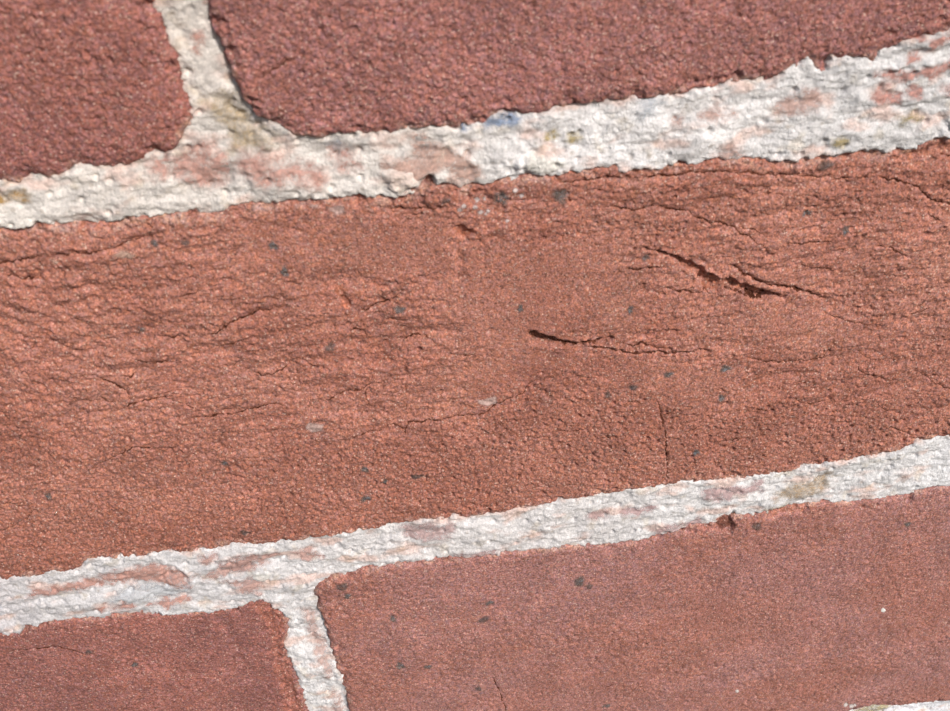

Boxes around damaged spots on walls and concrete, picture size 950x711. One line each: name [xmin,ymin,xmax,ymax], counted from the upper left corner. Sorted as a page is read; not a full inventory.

crack [384,204,452,212]
crack [872,175,950,222]
crack [559,170,881,329]
crack [552,336,705,355]
crack [743,350,828,363]